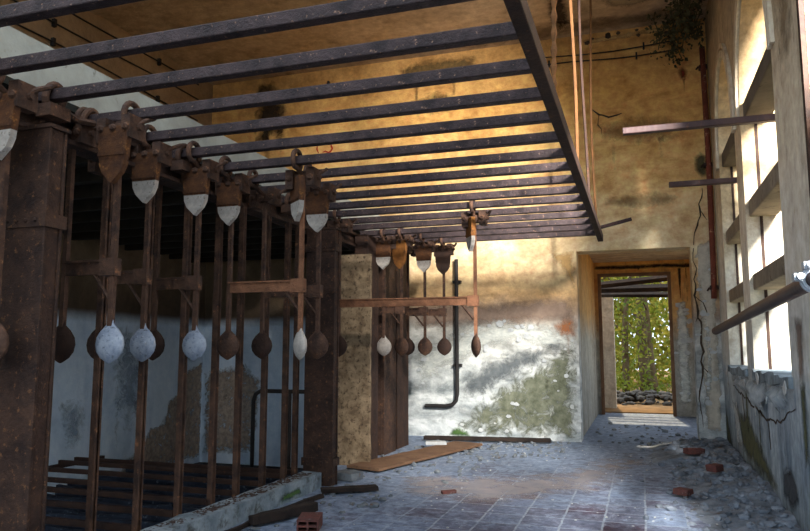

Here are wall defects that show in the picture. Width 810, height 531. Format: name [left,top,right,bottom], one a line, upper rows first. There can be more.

damp [258,105,284,119]
crack [692,189,708,427]
flaking render [144,363,259,462]
damp [460,344,582,441]
damp [739,393,776,487]
crack [733,385,795,449]